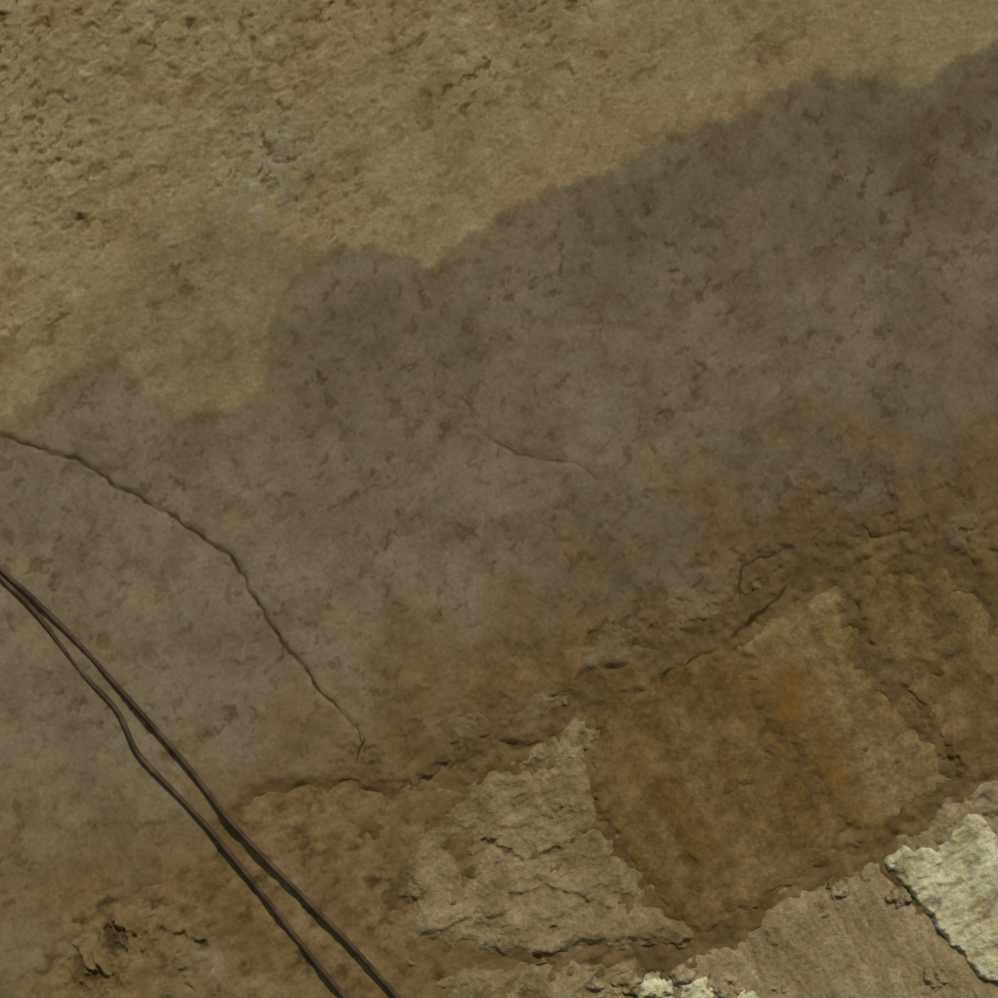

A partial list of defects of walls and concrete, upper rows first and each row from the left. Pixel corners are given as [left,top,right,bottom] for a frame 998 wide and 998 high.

water stain [0,572,226,998]
crack [4,434,239,569]
crack [252,593,338,707]
water stain [0,43,998,814]
spalling [31,508,998,998]